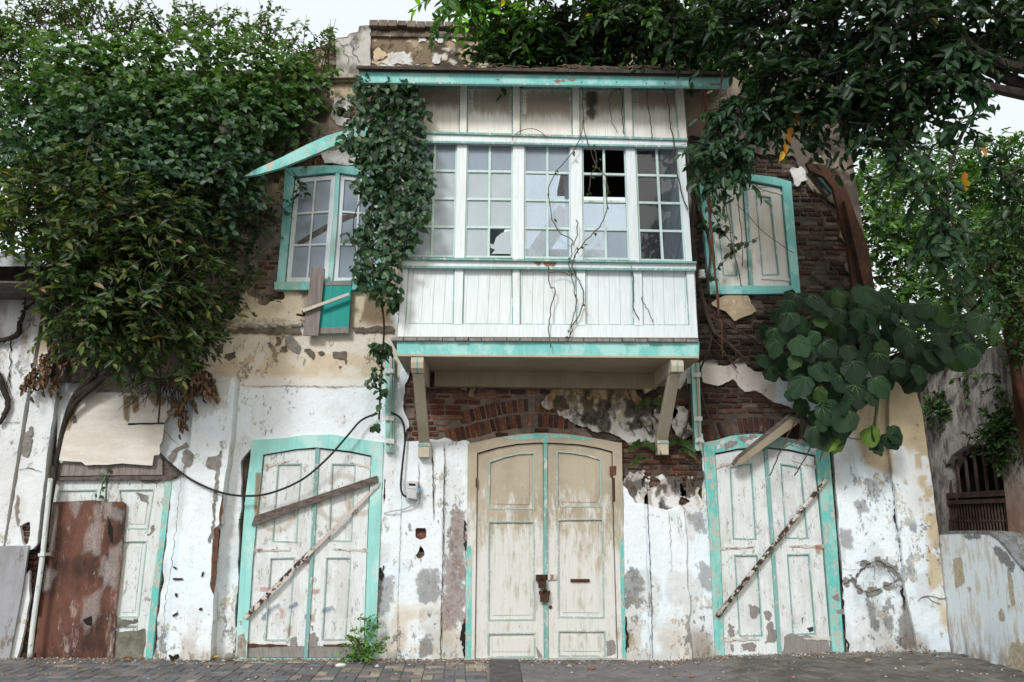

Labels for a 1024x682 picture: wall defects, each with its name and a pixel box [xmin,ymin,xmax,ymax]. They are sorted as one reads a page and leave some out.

peeling [371,31,473,67]
flaking render [745,155,850,298]
crack [5,333,13,392]
spalling [217,343,236,360]
spalling [232,327,347,368]
spalling [352,325,394,333]
flaking render [404,153,817,511]
spalling [168,442,193,478]
crack [12,495,20,526]
crack [830,452,947,651]
damp [415,508,468,658]